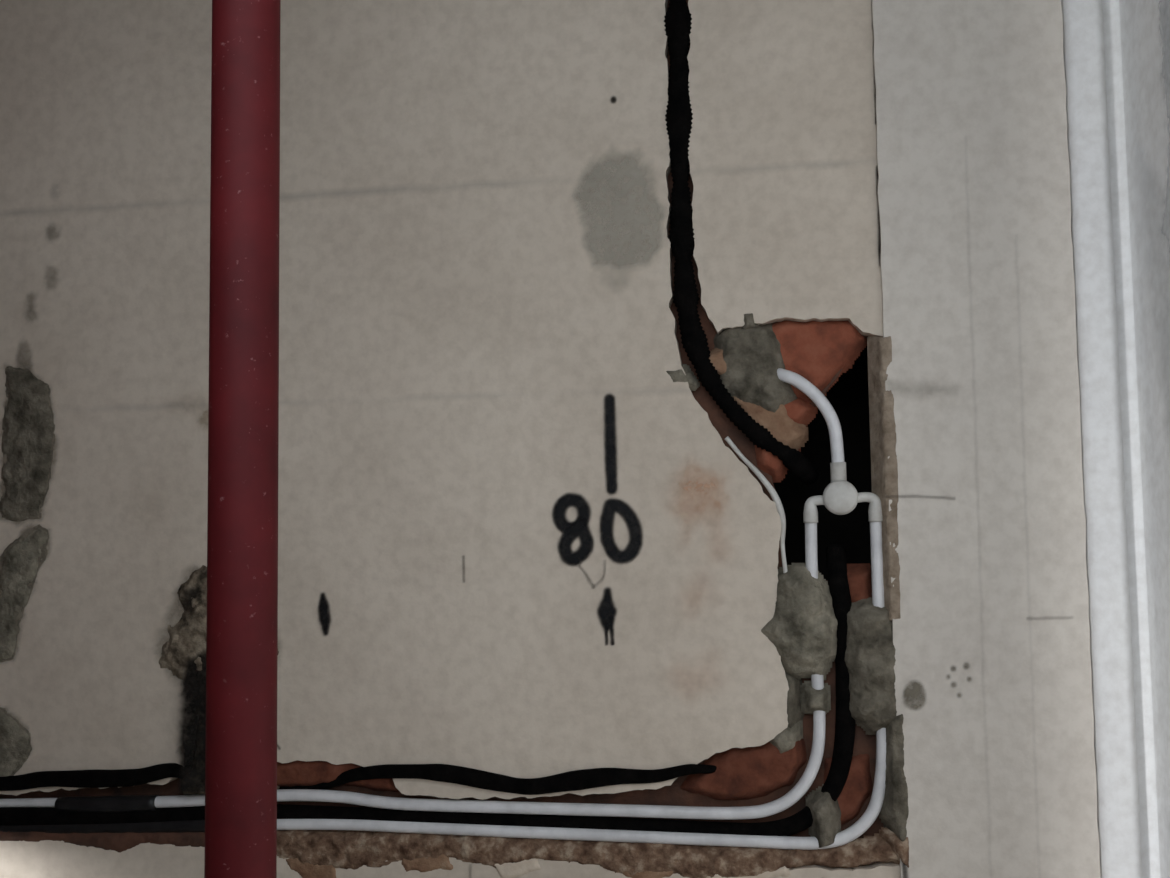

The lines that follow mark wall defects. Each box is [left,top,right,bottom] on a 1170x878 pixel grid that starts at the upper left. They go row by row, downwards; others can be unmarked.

flaking render [755,445,788,483]
spalling [772,320,901,621]
flaking render [680,720,807,801]
spalling [0,831,205,853]
spalling [277,754,909,878]